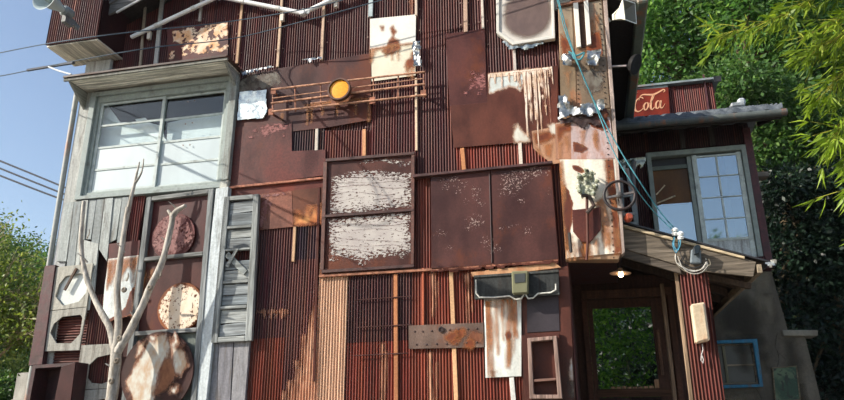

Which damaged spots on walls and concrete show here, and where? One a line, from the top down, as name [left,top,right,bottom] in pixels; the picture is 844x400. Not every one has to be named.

peeling [169,23,229,60]
rust [371,26,415,75]
leakage [488,68,553,149]
rust [534,118,610,156]
peeling [329,159,411,266]
rust [559,159,622,260]
peeling [136,335,157,358]
peeling [168,332,189,394]
rust [430,260,558,377]